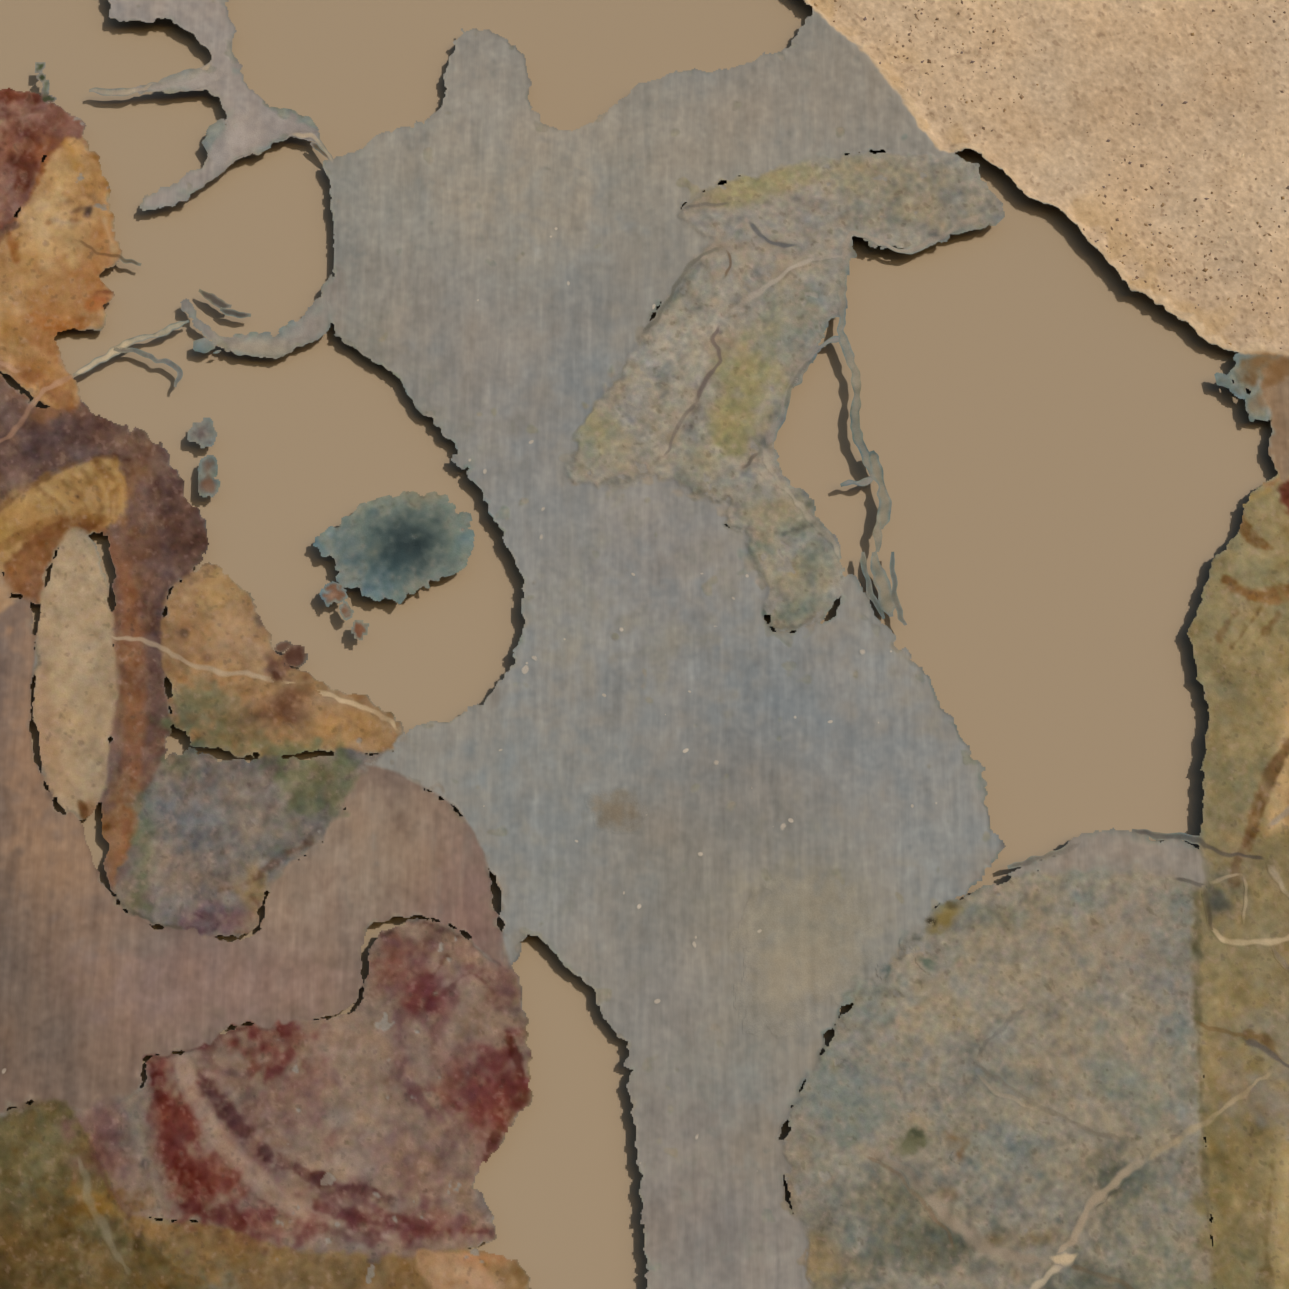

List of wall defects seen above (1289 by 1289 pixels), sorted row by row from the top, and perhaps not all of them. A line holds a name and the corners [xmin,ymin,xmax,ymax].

crack [291,132,335,163]
flaking render [805,0,1289,355]
crack [76,238,142,266]
crack [0,289,251,444]
flaking render [1267,382,1289,482]
leakage [313,504,452,604]
crack [110,634,398,732]
flaking render [0,0,1006,1289]
crack [1007,841,1082,869]
flaking render [1008,828,1209,885]
crack [1132,800,1289,971]
crack [864,1008,1289,1289]